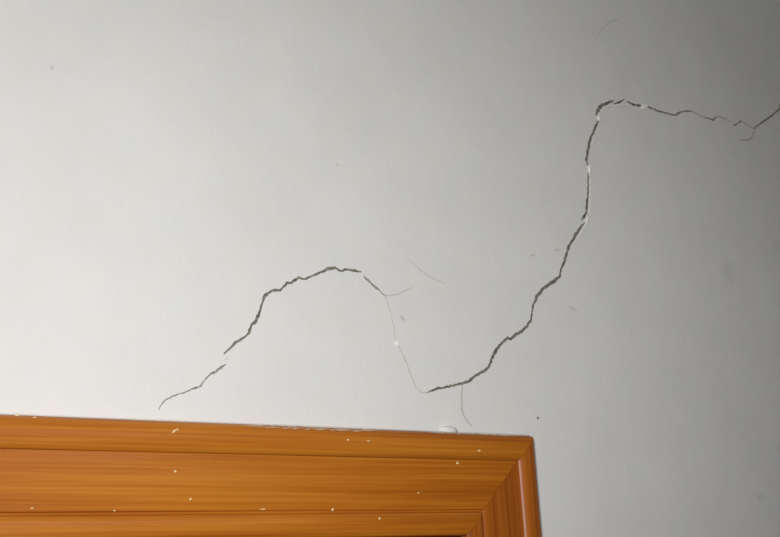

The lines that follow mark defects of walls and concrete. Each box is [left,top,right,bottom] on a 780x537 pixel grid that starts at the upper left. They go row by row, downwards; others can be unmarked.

crack [158,99,780,427]